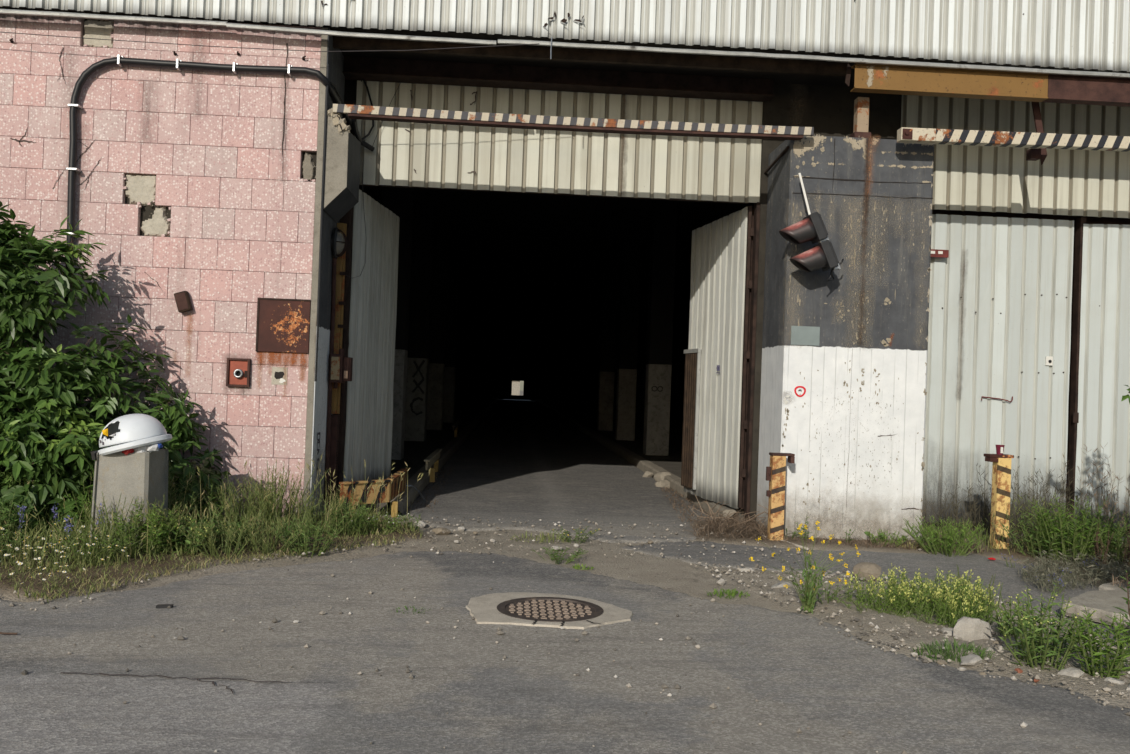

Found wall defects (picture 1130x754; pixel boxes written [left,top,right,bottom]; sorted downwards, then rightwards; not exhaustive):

peeling [299,152,317,182]
spalling [793,134,934,187]
peeling [123,174,171,237]
peeling [792,196,932,345]
rust [258,351,307,378]
peeling [832,361,904,429]
peeling [801,418,898,513]
crack [61,672,281,694]